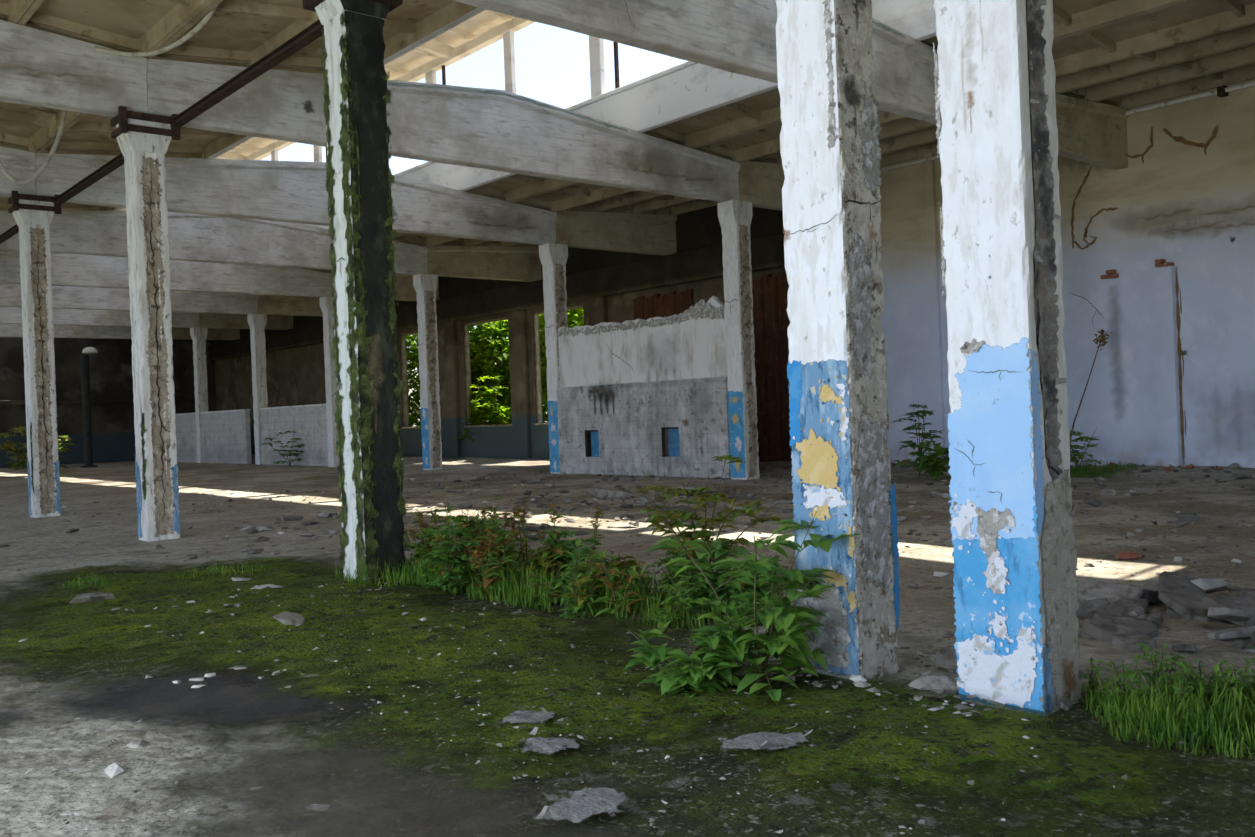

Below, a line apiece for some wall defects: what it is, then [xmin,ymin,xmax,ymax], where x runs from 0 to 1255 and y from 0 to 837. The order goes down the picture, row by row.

leakage [590,385,614,414]
spalling [555,264,724,379]
spalling [731,225,757,477]
spalling [793,369,900,669]
spalling [848,233,876,379]
spalling [951,0,1082,714]